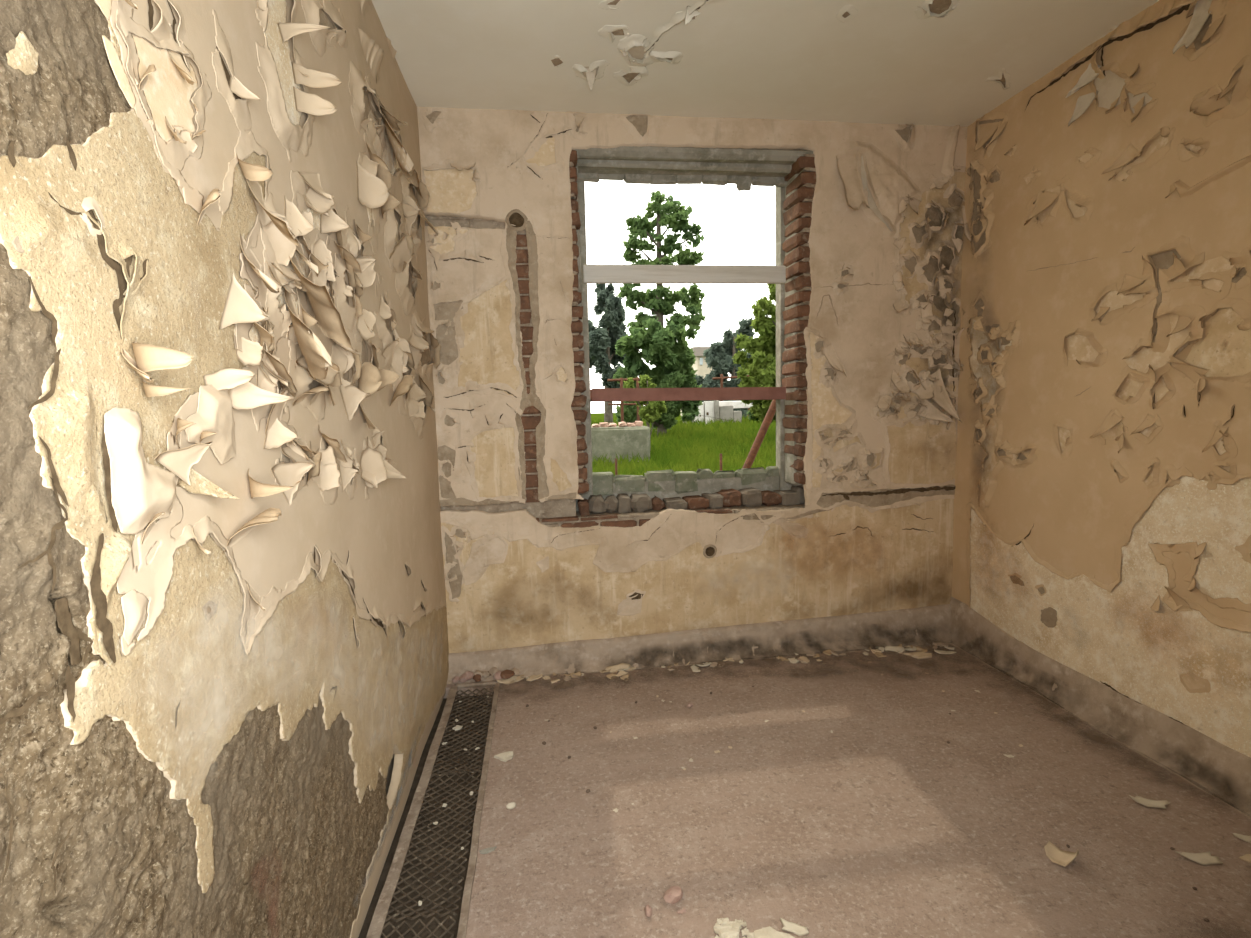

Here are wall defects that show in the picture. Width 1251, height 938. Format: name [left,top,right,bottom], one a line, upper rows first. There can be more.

crack [1023,0,1198,112]
peeling [1173,0,1228,61]
peeling [1066,62,1158,127]
peeling [1102,54,1251,182]
peeling [836,153,1004,488]
flaking render [0,0,960,938]
peeling [966,290,1251,758]
water stain [632,634,827,667]
water stain [861,628,935,650]
peeling [1129,795,1170,809]
water stain [1180,757,1237,807]